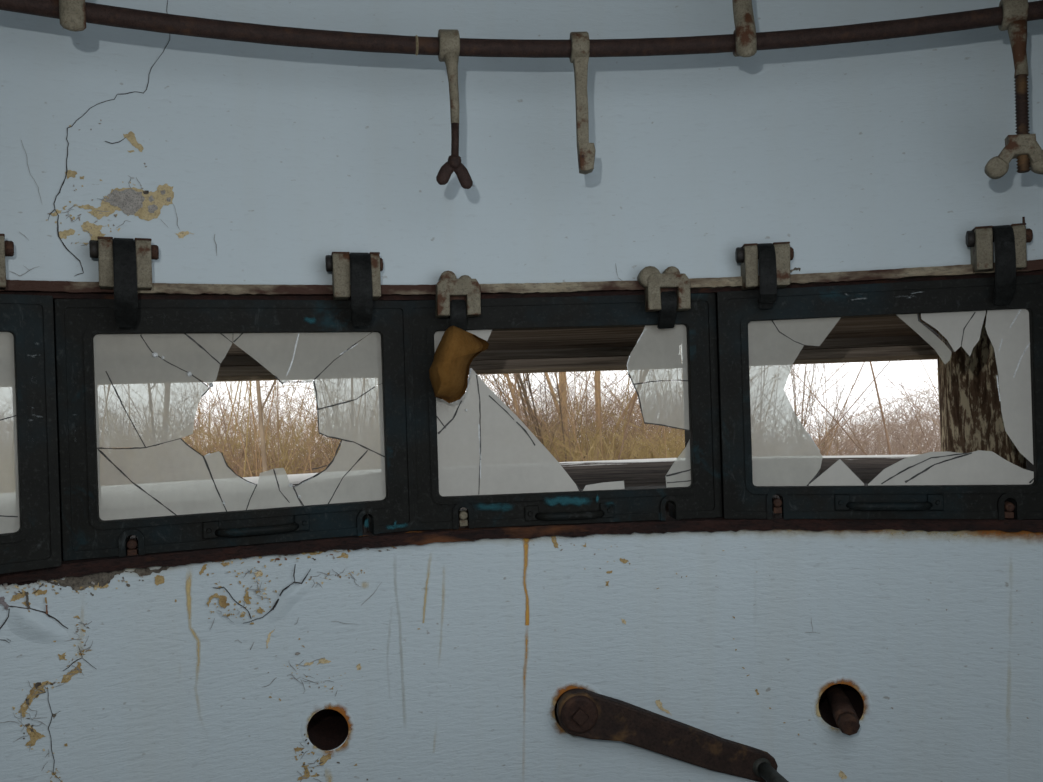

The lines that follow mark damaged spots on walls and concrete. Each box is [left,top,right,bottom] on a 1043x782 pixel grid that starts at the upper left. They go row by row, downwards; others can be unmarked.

crack [21,40,170,276]
peeling [123,131,147,168]
peeling [46,170,174,246]
corrosion [838,529,1043,537]
corrosion [186,577,199,657]
crack [213,564,311,650]
peeling [199,549,365,629]
crack [0,590,96,780]
peeling [12,616,93,782]
corrosion [328,706,352,751]